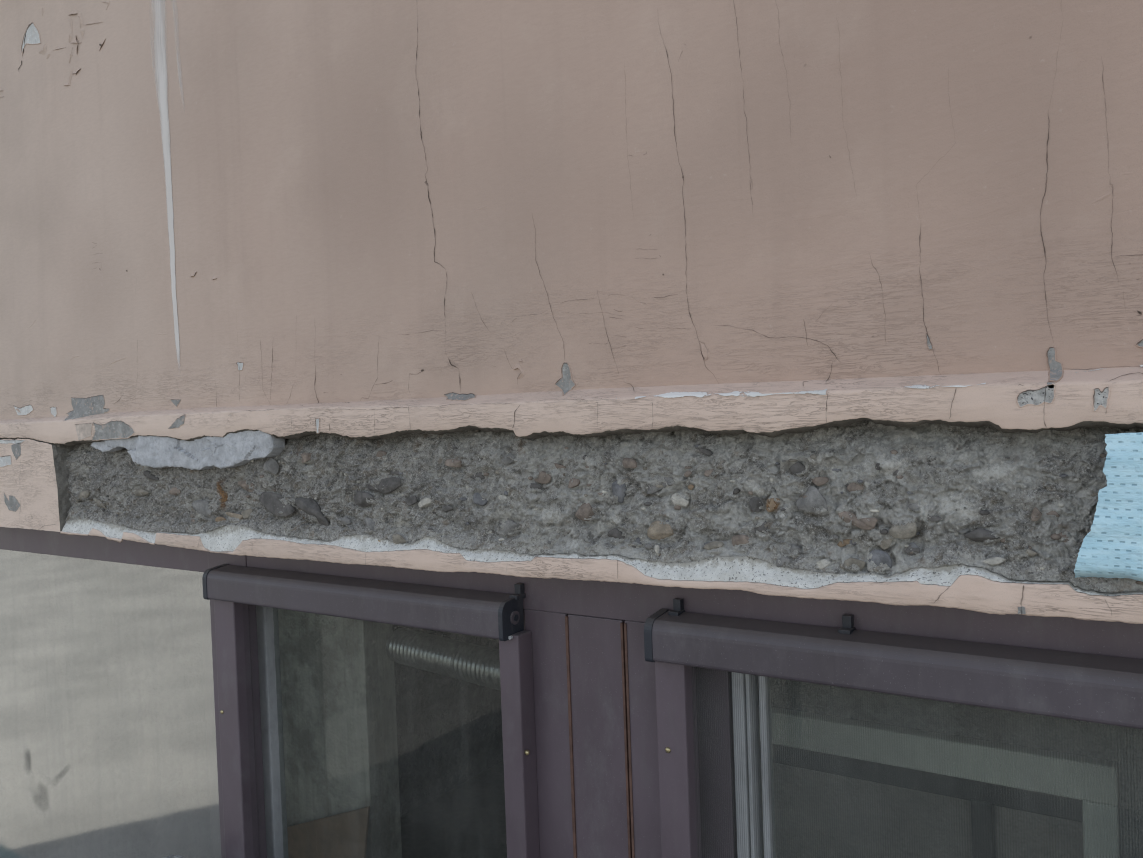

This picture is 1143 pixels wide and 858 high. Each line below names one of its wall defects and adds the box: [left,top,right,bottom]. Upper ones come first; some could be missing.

peeling [18,8,50,71]
water stain [154,0,180,362]
peeling [1017,347,1100,408]
peeling [444,392,476,401]
peeling [635,389,827,399]
peeling [1093,386,1110,412]
peeling [0,439,25,467]
peeling [4,493,21,512]
spalling [50,395,1143,596]